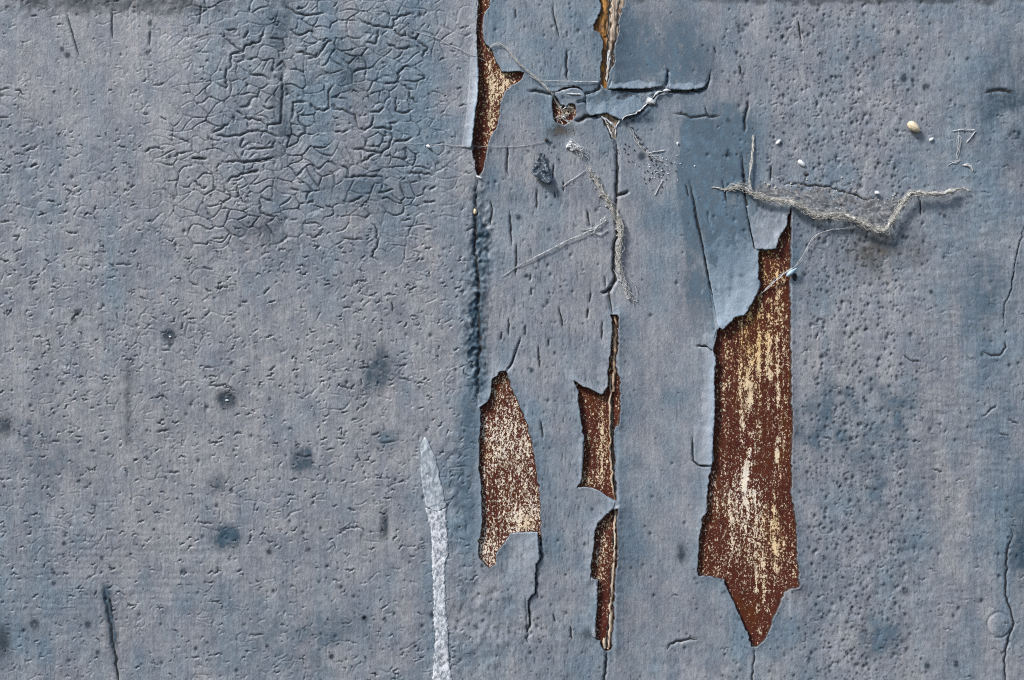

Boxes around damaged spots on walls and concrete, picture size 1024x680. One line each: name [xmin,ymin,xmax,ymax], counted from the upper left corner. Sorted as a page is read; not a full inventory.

crack [143,7,435,261]
peeling [461,0,523,175]
crack [473,0,878,406]
peeling [479,372,541,626]
peeling [571,315,620,650]
peeling [693,203,798,645]